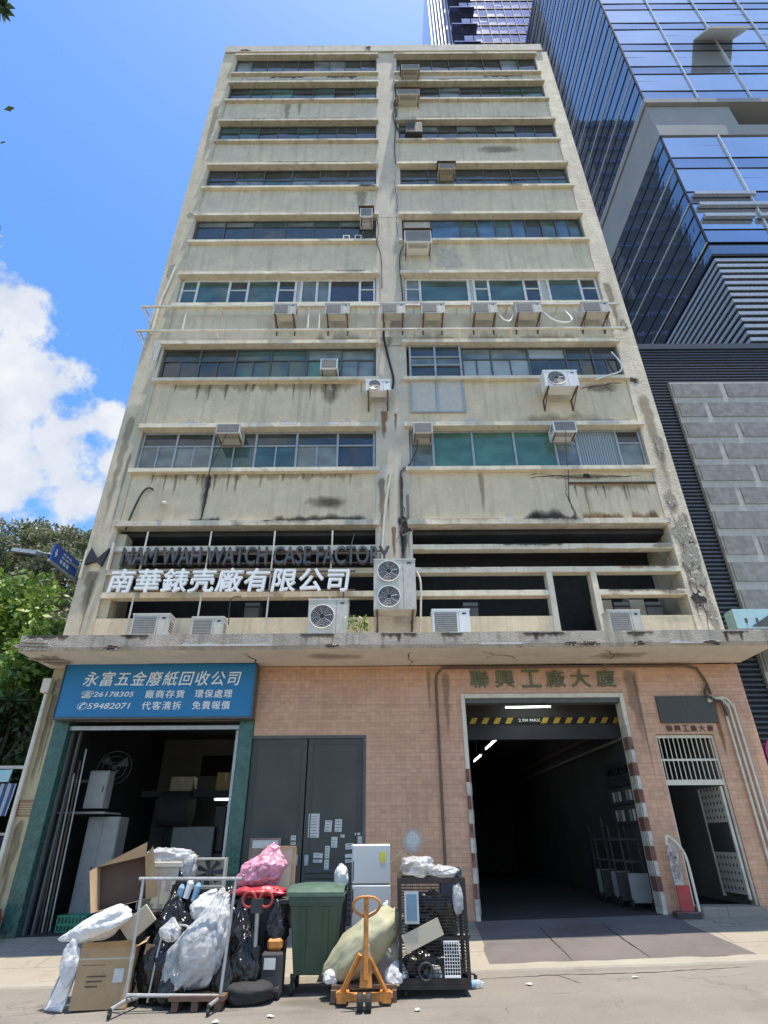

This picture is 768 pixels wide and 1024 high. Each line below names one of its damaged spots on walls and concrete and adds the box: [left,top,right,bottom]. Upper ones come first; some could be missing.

corrosion [381,411,397,434]
leakage [506,511,577,520]
spalling [653,492,708,608]